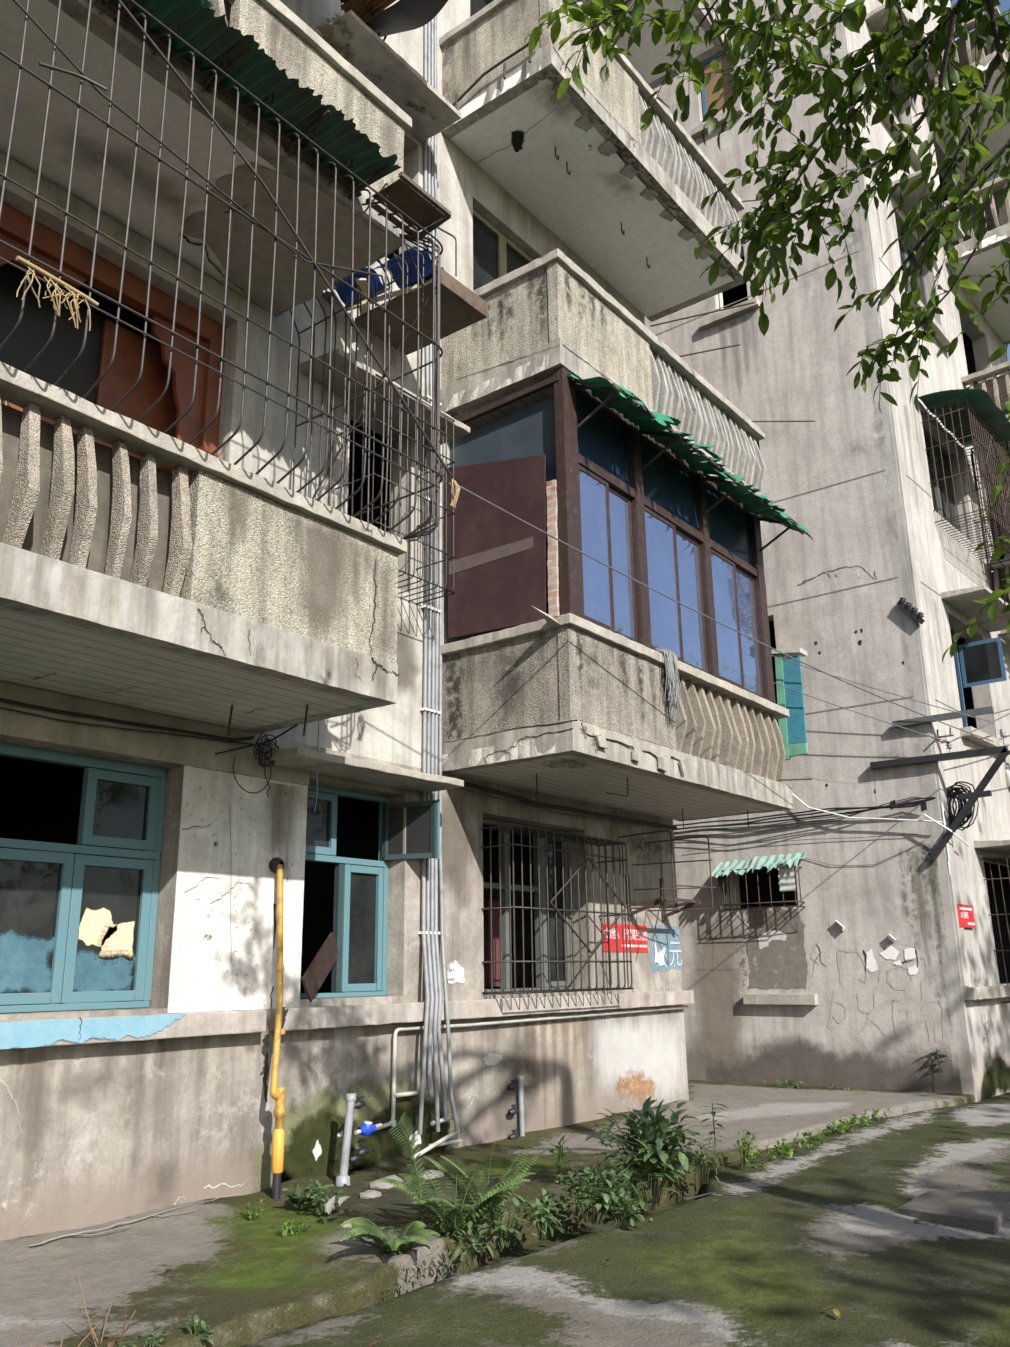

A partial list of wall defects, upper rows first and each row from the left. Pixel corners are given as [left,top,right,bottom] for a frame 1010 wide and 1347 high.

crack [197,608,251,656]
crack [355,559,399,682]
water stain [446,654,462,740]
peeling [0,1014,185,1049]
water stain [697,918,962,1094]
water stain [984,1023,1003,1073]